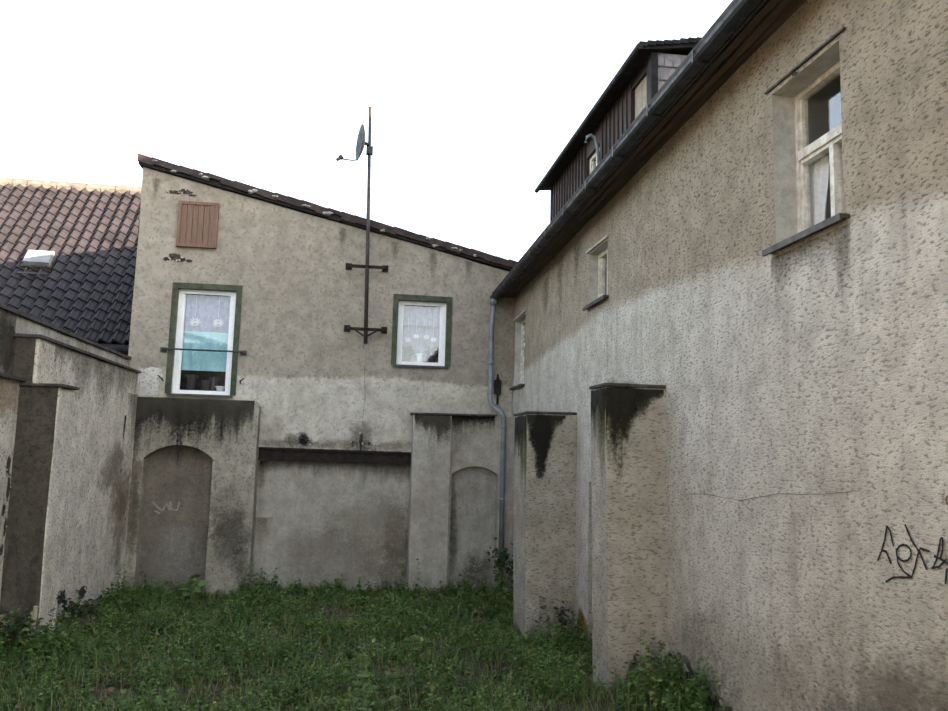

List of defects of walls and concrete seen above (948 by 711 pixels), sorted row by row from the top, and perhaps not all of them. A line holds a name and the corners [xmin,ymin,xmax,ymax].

damp [123,397,255,460]
damp [514,413,565,483]
damp [591,382,664,455]
crack [686,490,860,520]